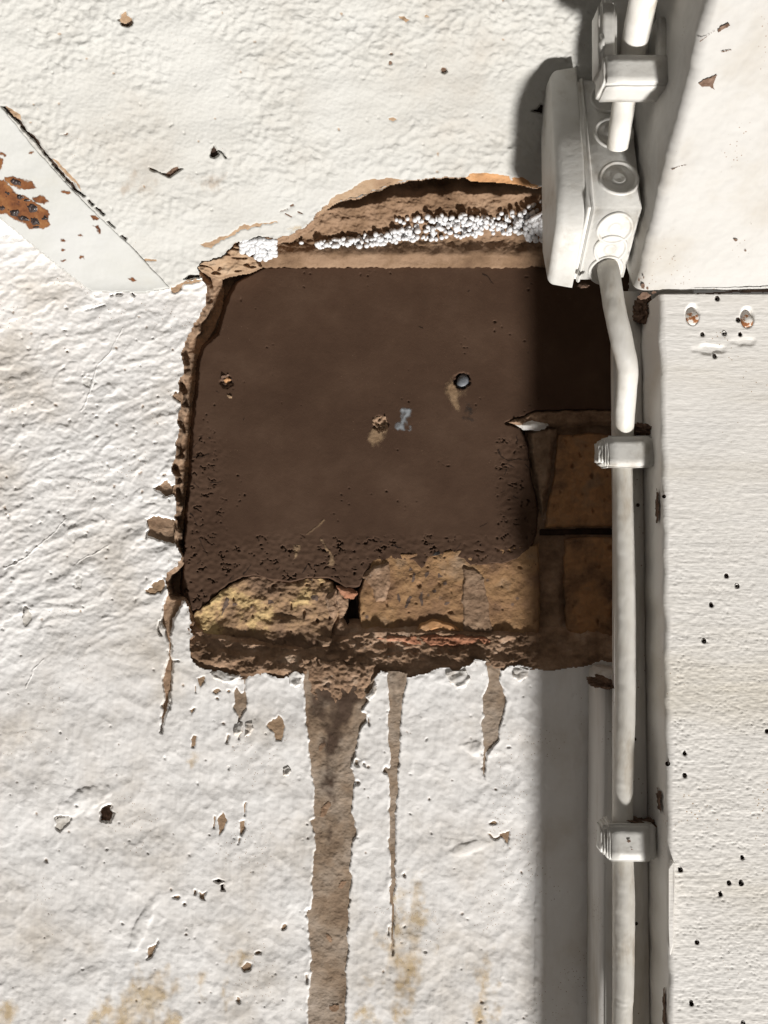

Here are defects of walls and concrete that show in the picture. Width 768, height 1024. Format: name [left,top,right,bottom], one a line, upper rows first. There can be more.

rust [0,152,50,229]
flaking render [200,173,539,254]
flaking render [145,272,612,649]
spalling [195,670,254,743]
spalling [267,716,285,741]
damp [312,682,361,754]
spalling [213,813,227,835]